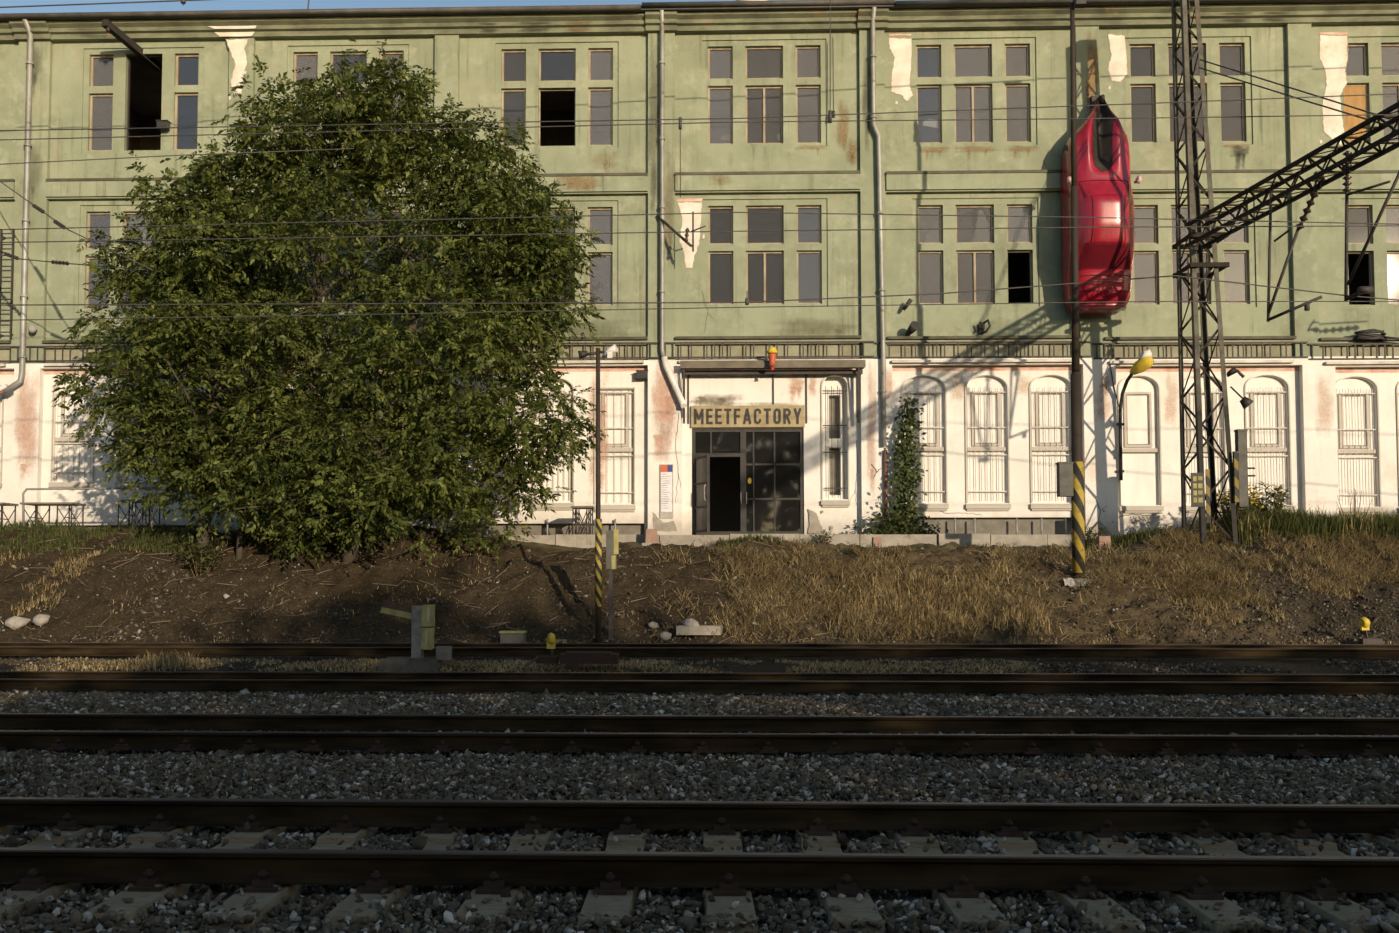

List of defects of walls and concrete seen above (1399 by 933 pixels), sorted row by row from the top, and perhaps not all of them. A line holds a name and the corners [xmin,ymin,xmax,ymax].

peeling [209,25,257,100]
peeling [888,34,914,104]
peeling [1107,33,1128,90]
peeling [1318,32,1349,146]
peeling [676,198,705,269]